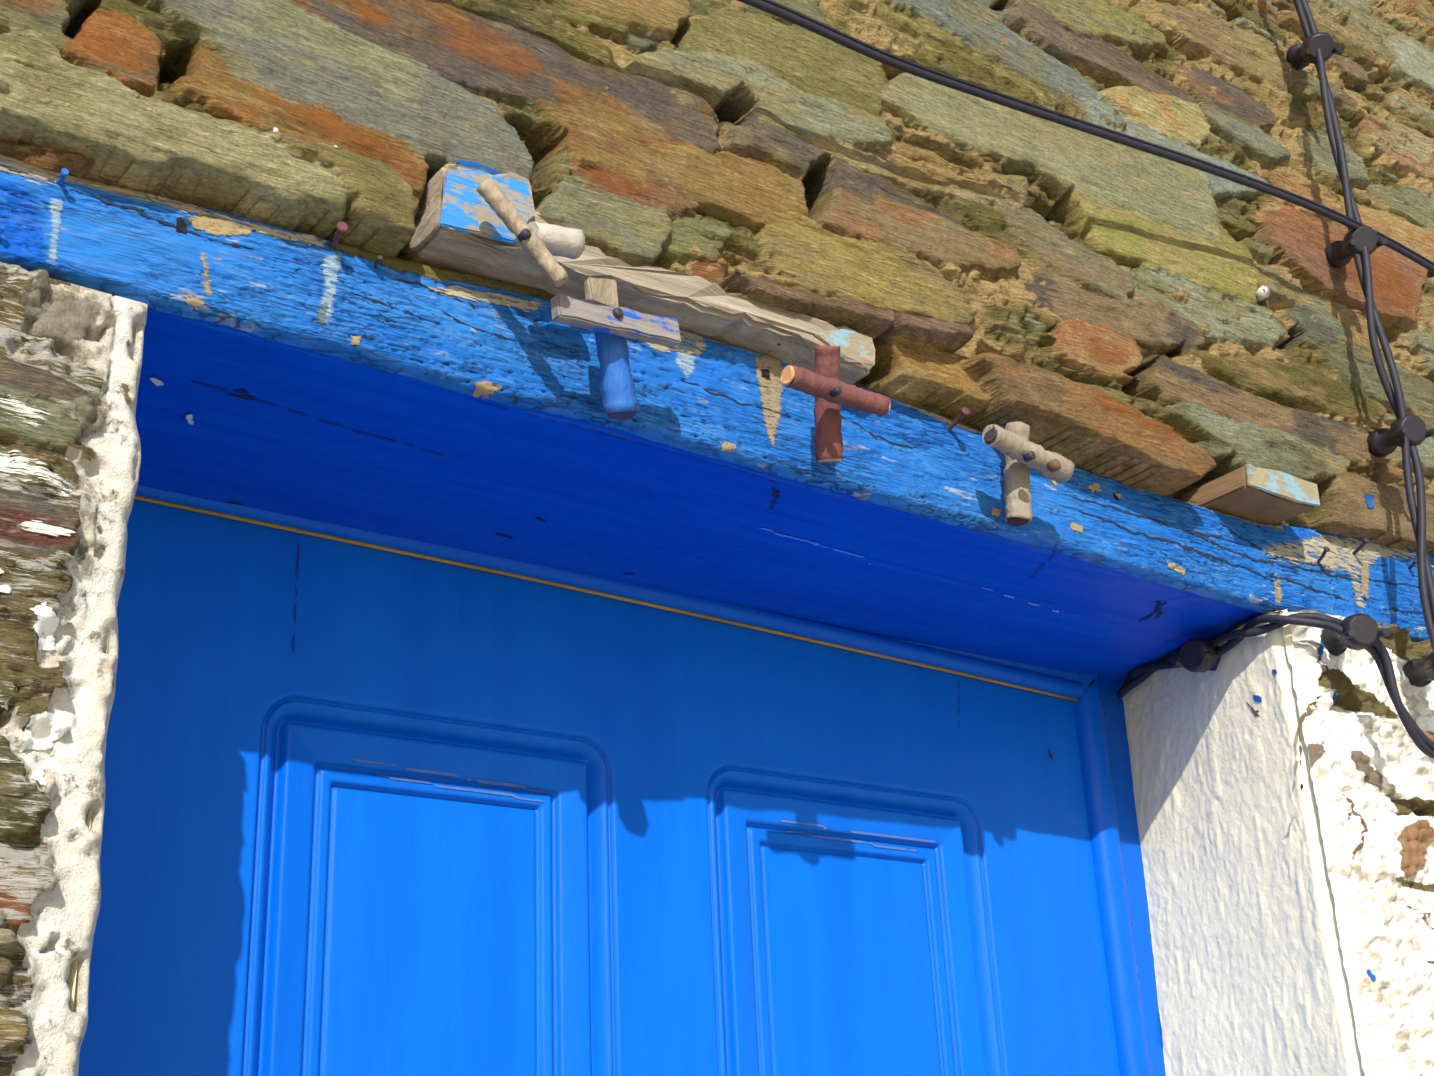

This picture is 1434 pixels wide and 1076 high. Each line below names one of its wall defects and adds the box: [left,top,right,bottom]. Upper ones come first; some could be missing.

peeling [156,201,326,248]
flaking render [19,285,102,353]
peeling [427,285,543,313]
peeling [0,393,53,427]
peeling [473,381,502,400]
peeling [0,447,74,497]
peeling [19,520,93,570]
peeling [1264,534,1434,608]
peeling [1378,627,1429,661]
peeling [1318,664,1398,718]
peeling [1308,741,1326,767]
peeling [1350,750,1434,892]